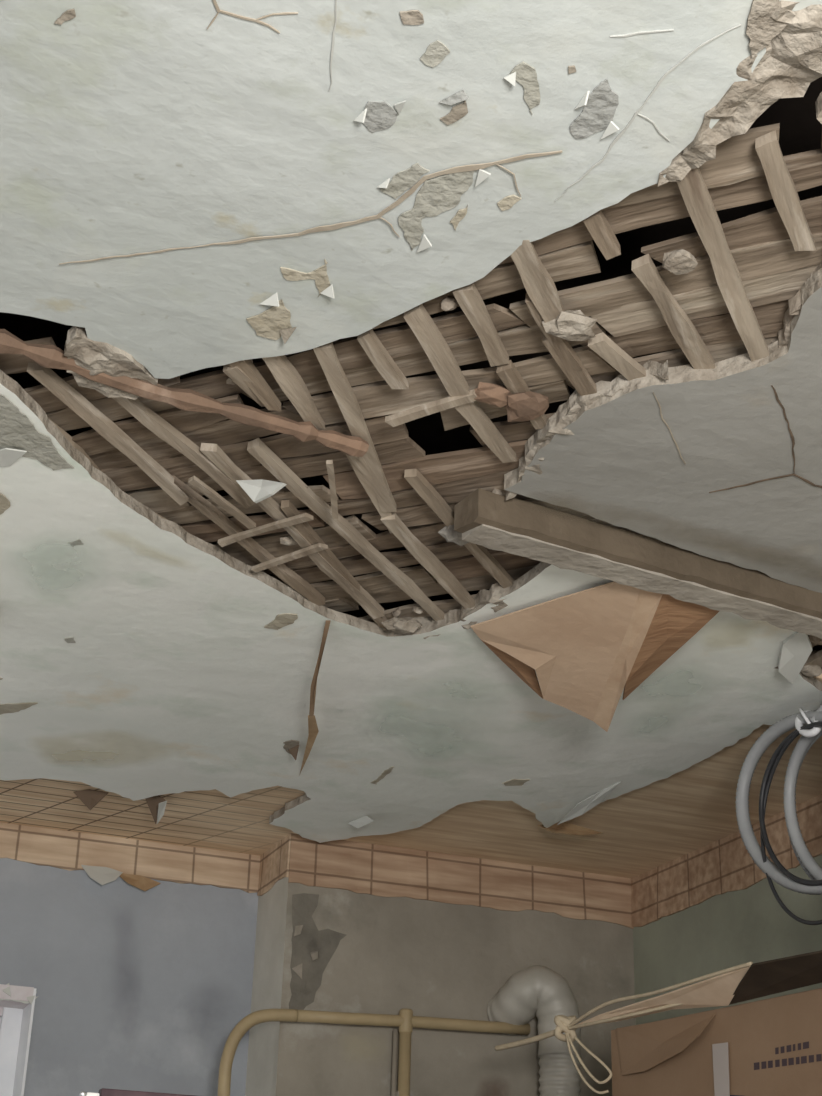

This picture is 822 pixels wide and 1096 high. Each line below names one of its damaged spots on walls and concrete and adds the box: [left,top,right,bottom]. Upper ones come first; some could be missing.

crack [207,0,298,34]
flaking render [570,79,619,140]
crack [555,24,741,201]
crack [59,150,562,265]
flaking render [378,163,491,253]
flaking render [0,394,74,471]
crack [709,385,822,493]
flaking render [236,479,287,503]
spalling [775,632,822,685]
peeling [0,778,306,856]
peeling [342,724,822,879]
flaking render [289,893,346,1010]